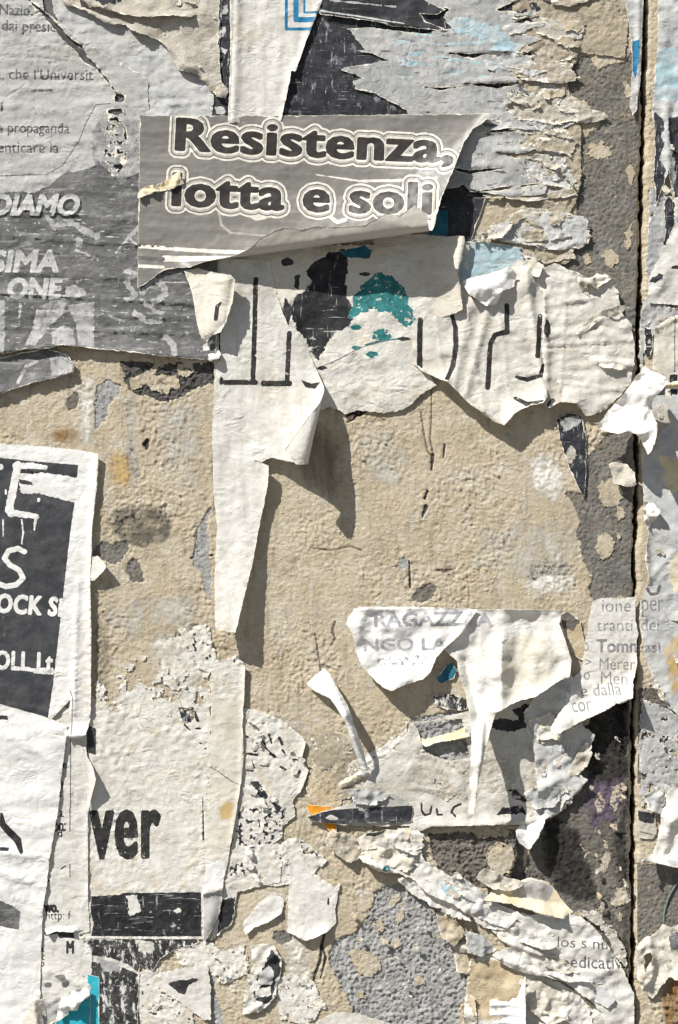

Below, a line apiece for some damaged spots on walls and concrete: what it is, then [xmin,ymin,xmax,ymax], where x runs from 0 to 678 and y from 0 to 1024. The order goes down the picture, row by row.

spalling [501,0,639,340]
spalling [94,361,215,429]
leakage [115,509,171,545]
spalling [192,508,213,600]
spalling [410,710,469,761]
spalling [428,688,678,982]
spalling [329,883,477,1024]